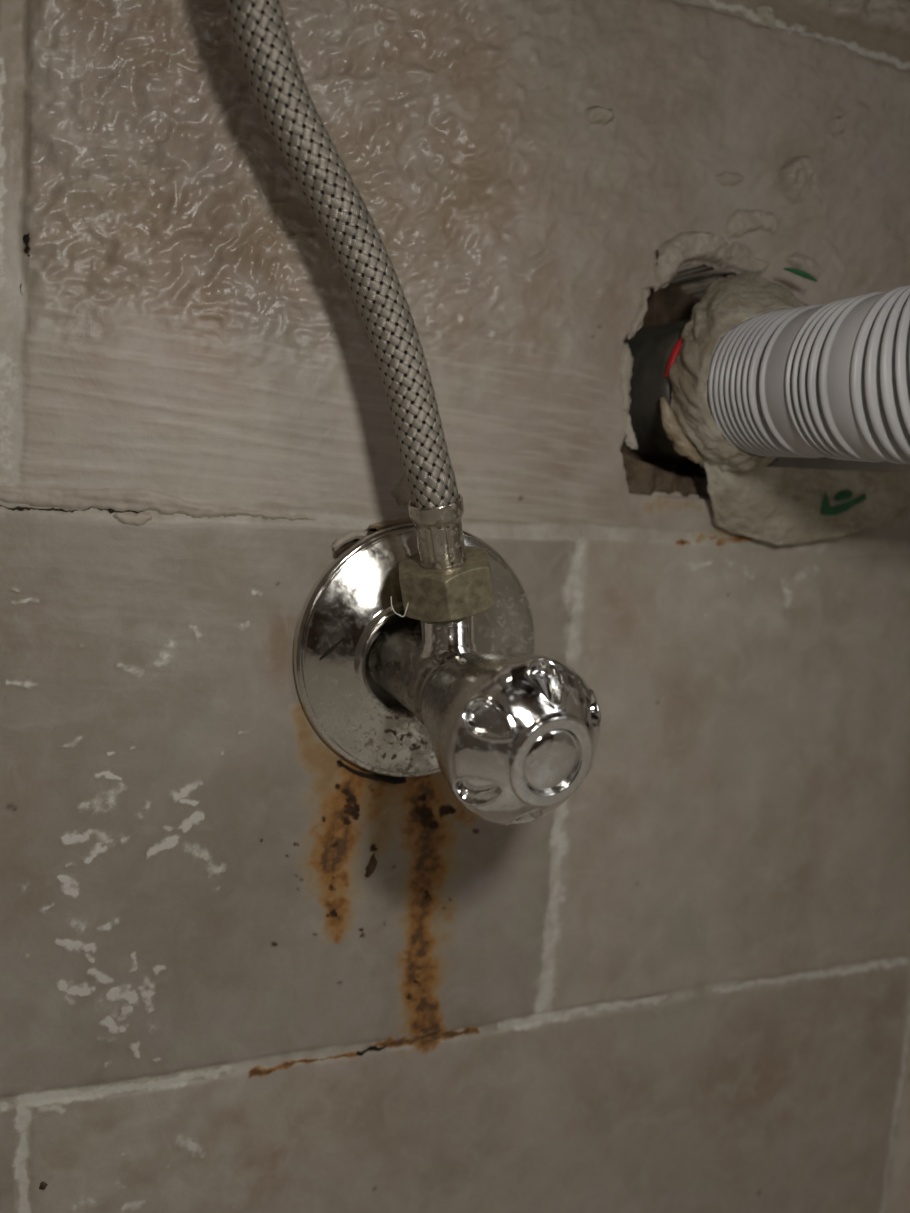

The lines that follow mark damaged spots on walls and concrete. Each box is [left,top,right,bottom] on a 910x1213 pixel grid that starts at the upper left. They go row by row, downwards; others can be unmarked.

spalling [618,231,822,499]
corrosion [244,693,488,1081]